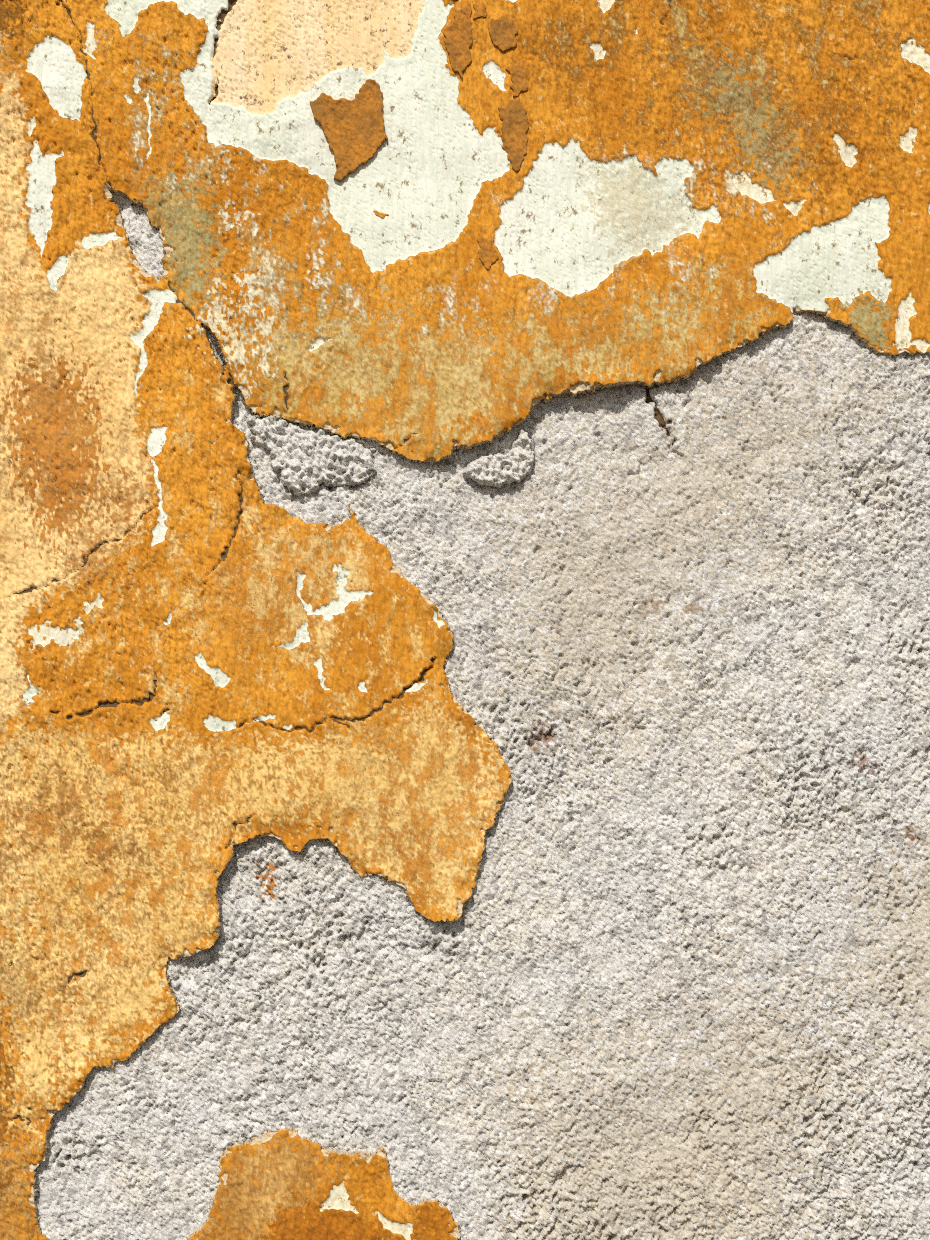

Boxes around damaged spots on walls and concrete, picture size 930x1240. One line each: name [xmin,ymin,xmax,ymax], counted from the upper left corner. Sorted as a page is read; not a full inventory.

peeling [25,35,87,122]
crack [56,0,108,183]
peeling [901,38,930,74]
peeling [105,0,807,329]
peeling [832,134,858,168]
peeling [305,239,366,352]
crack [646,388,676,446]
crack [0,505,158,599]
crack [202,469,244,597]
crack [51,676,170,721]
peeling [185,652,243,688]
crack [239,658,436,733]